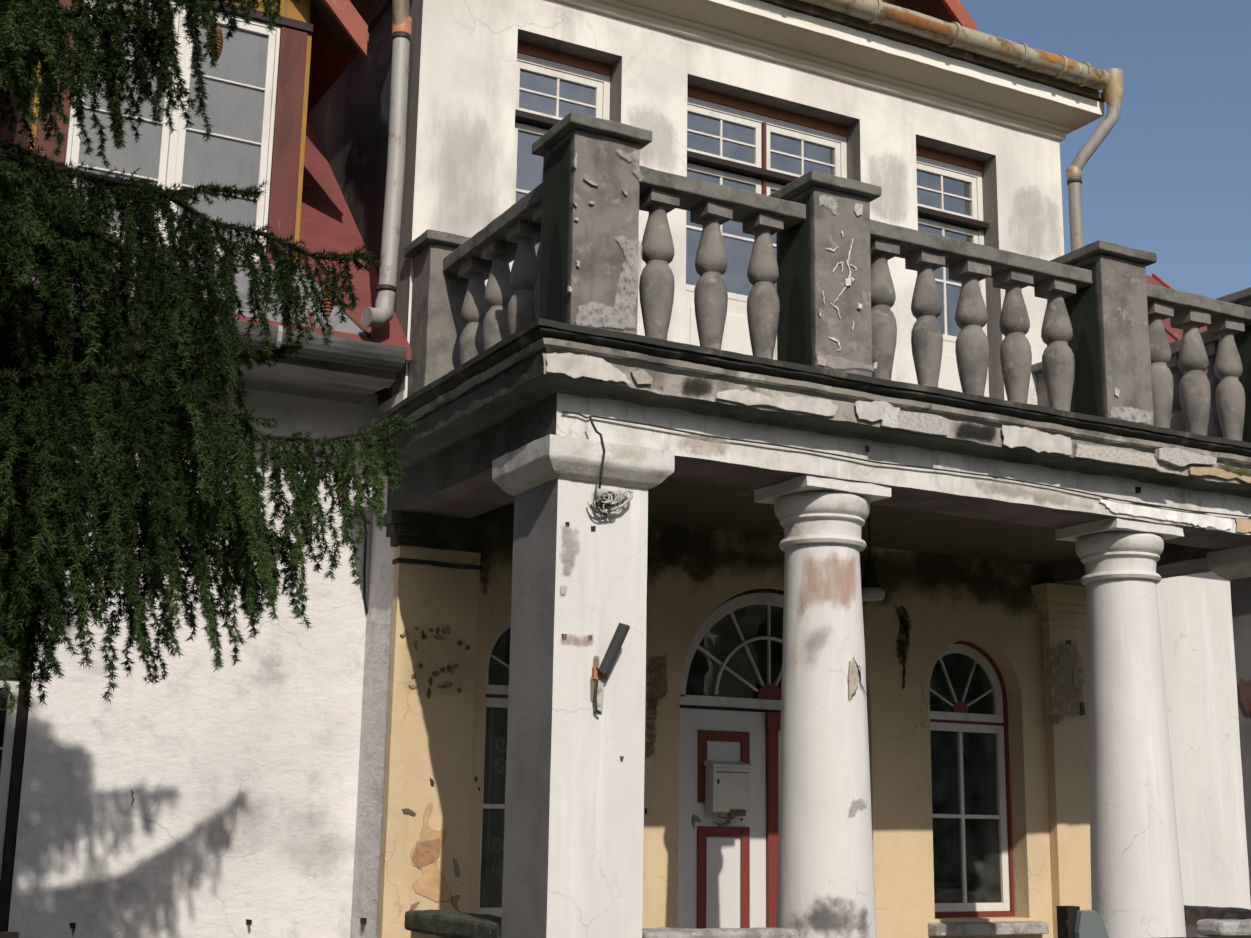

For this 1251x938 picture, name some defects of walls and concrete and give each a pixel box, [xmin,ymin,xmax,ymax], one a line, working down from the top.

rust [885,6,952,36]
rust [1036,48,1076,67]
peeling [576,236,642,329]
crack [817,231,862,351]
peeling [716,389,838,416]
peeling [855,400,952,436]
peeling [1002,425,1251,483]
peeling [1100,487,1251,533]
leakage [471,504,514,593]
leakage [647,521,784,580]
leakage [860,550,1008,689]
peeling [402,802,460,910]